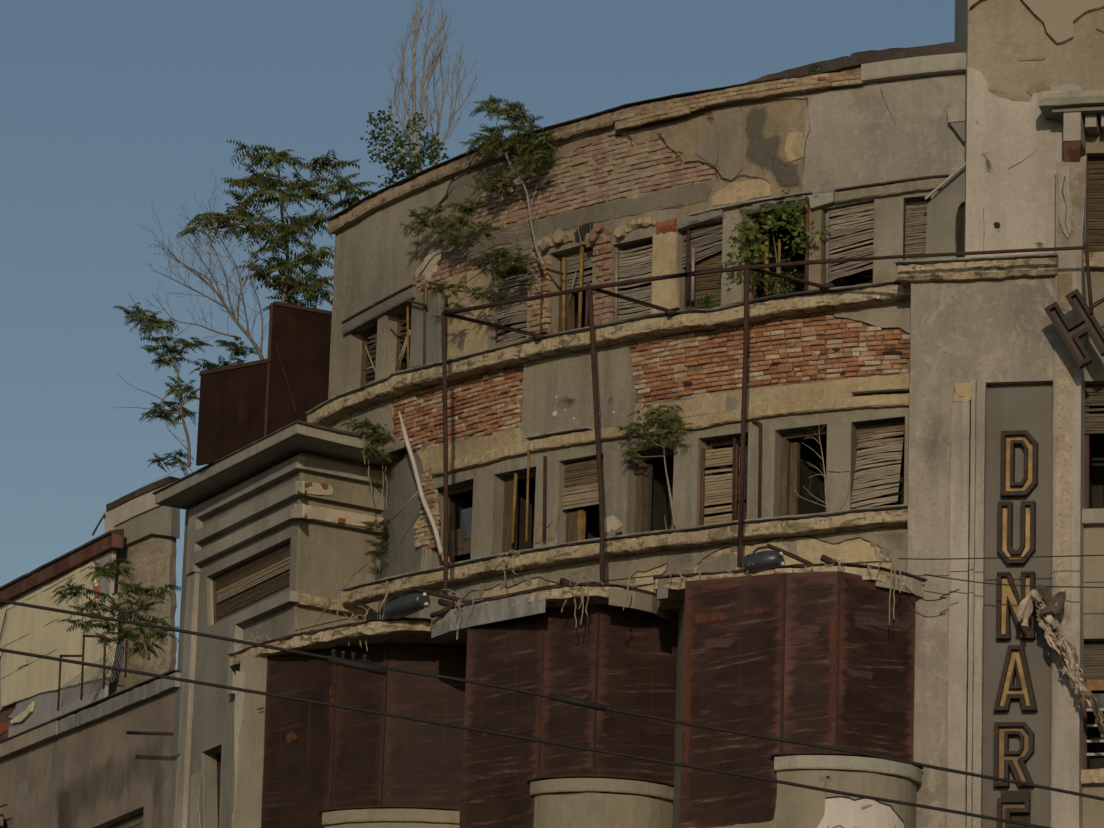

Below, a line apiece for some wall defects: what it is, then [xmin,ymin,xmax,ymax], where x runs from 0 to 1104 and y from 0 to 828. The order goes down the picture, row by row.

flaking render [968,0,1104,102]
crack [659,133,771,184]
flaking render [413,72,864,351]
flaking render [629,270,910,424]
flaking render [371,348,523,549]
flaking render [627,562,668,592]
flaking render [694,529,891,572]
flaking render [817,796,904,828]